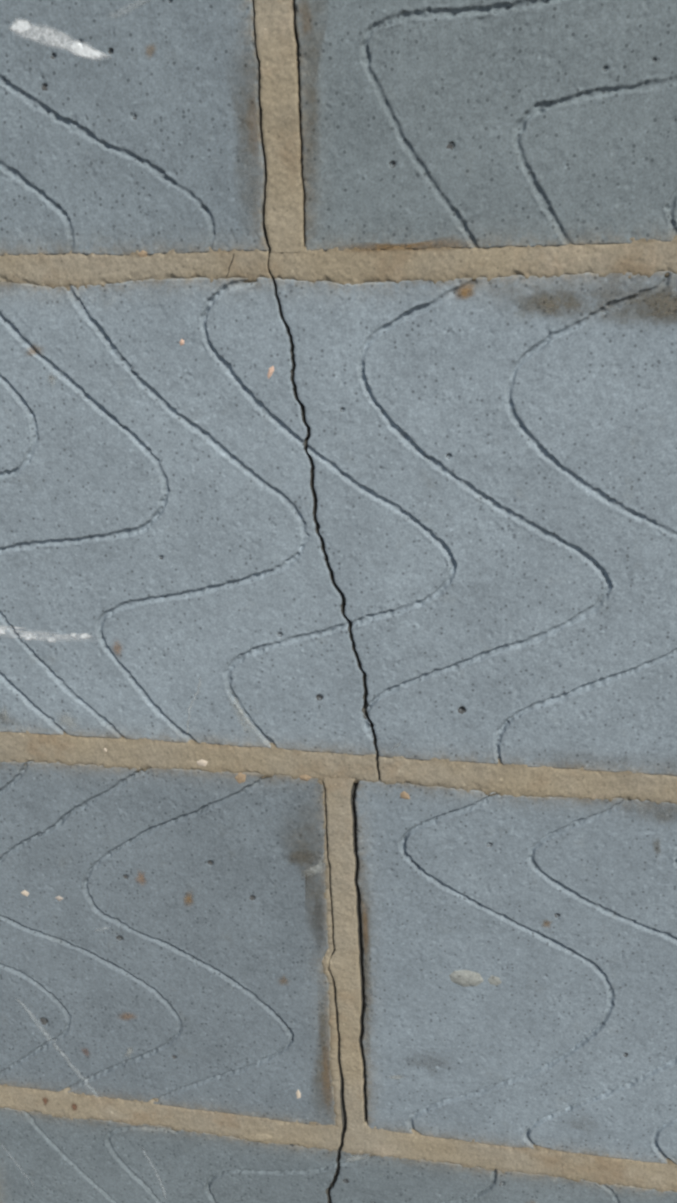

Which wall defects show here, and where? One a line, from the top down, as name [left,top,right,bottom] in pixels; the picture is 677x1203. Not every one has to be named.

crack [253,0,380,1203]